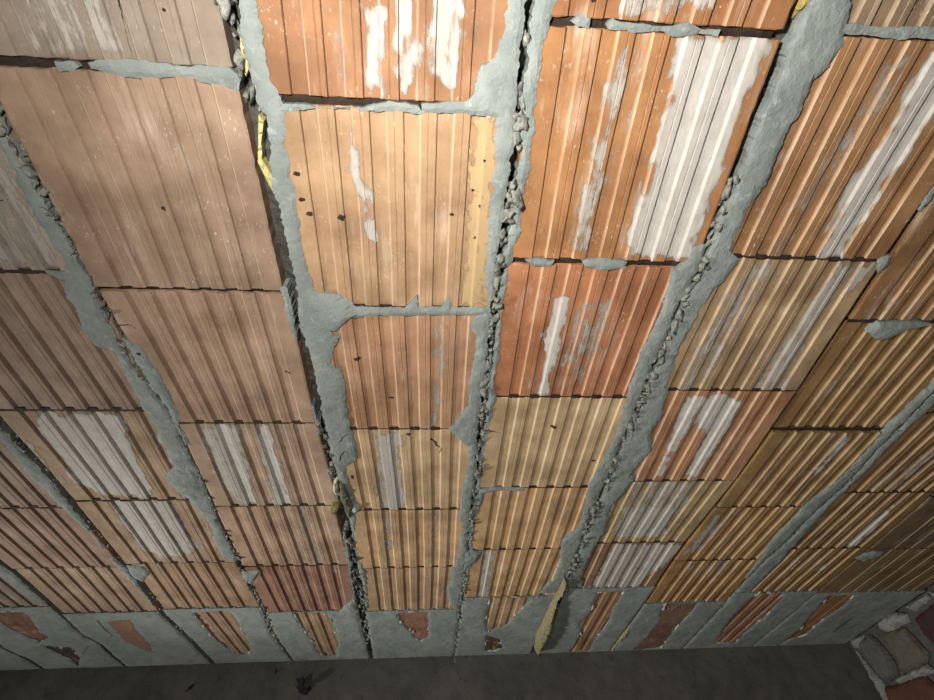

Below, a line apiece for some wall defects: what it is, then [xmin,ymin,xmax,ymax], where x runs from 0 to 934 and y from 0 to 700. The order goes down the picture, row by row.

damp [359,0,465,98]
crack [844,32,883,40]
efflorescence [626,35,773,262]
damp [754,51,934,391]
crack [733,253,877,262]
crack [0,0,793,654]
efflorescence [25,411,204,559]
crack [687,505,868,568]
spalling [0,611,80,666]
spalling [195,611,251,655]
spalling [294,612,339,657]
spalling [570,591,625,652]